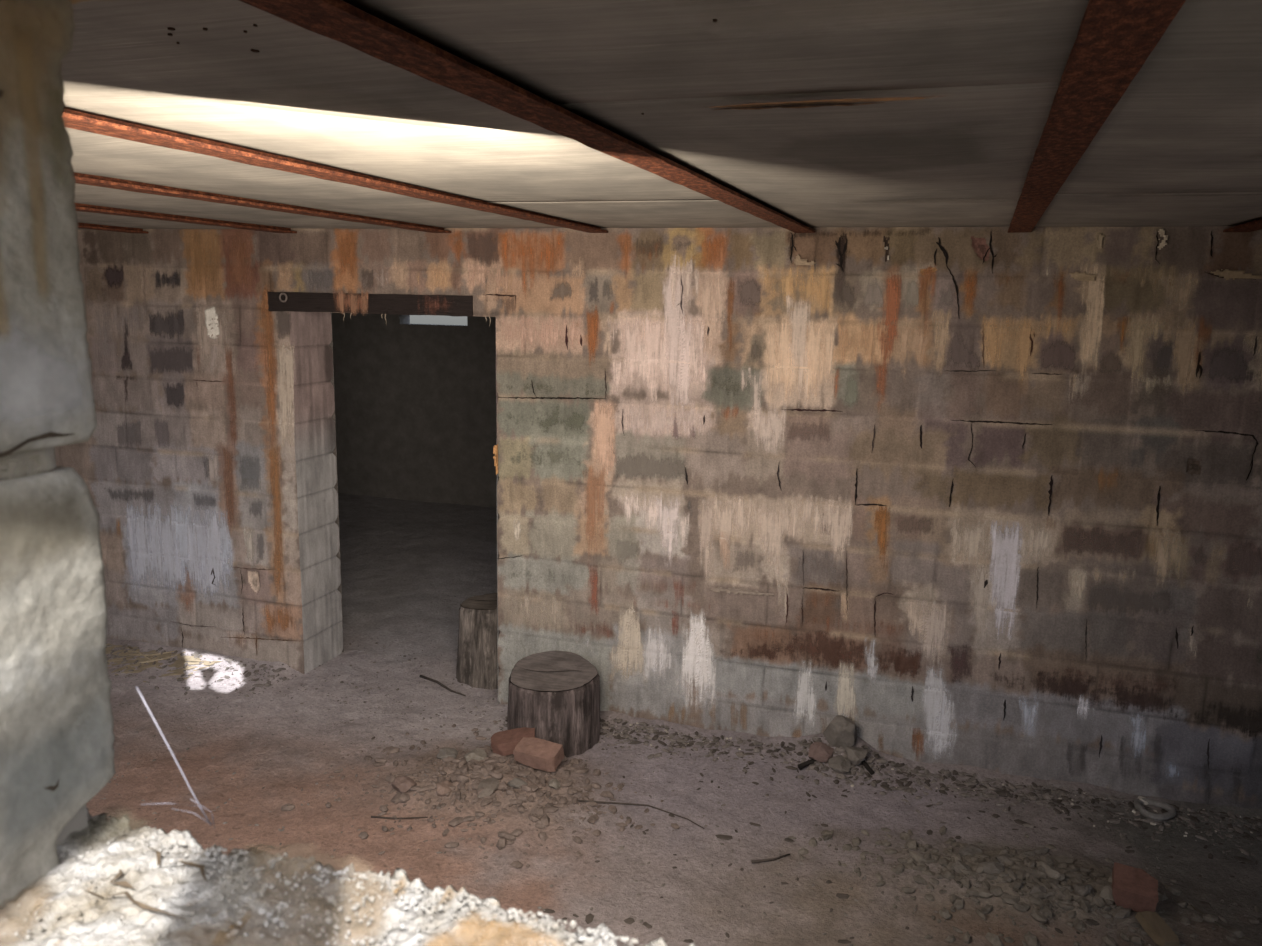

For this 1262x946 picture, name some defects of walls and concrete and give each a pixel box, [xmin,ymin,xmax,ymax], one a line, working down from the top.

crack [934,237,995,372]
crack [983,233,997,274]
rust [262,291,277,434]
crack [1195,430,1259,480]
rust [270,452,283,589]
damp [953,524,1141,634]
damp [1072,538,1262,615]
efflorescence [612,605,715,697]
damp [732,602,970,754]
damp [995,670,1177,757]